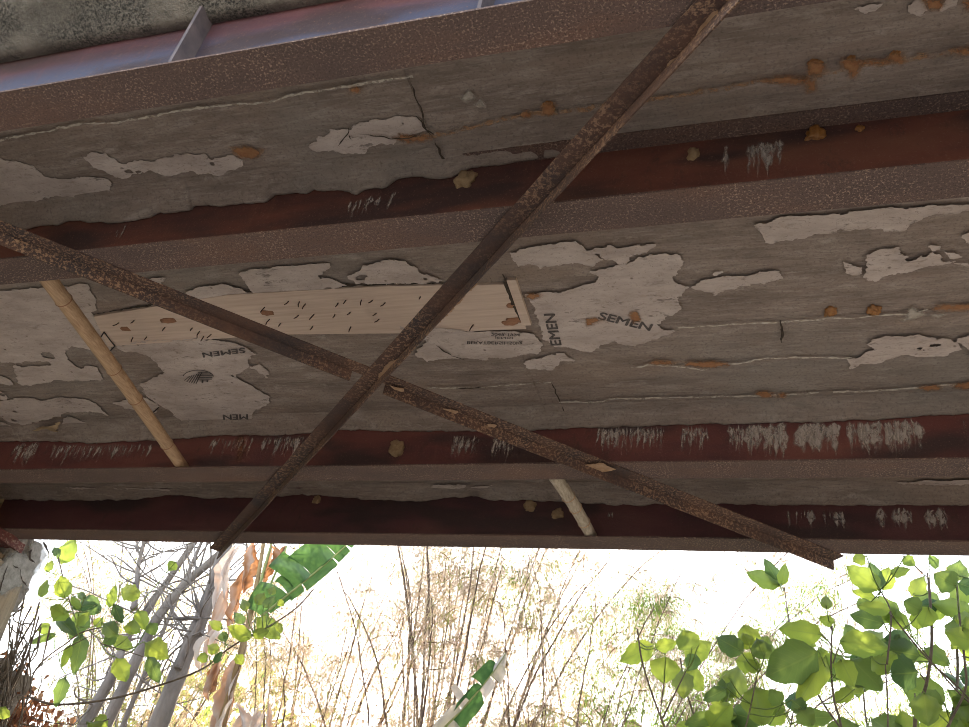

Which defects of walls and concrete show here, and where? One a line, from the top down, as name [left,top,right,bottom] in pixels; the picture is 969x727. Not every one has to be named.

crack [338,77,445,159]
peeling [754,204,969,244]
peeling [415,241,783,370]
peeling [0,287,108,426]
peeling [64,283,270,421]
peeling [847,334,969,369]
efflorescence [596,427,662,446]
efflorescence [727,419,924,453]
damp [788,510,845,525]
efflorescence [876,508,912,528]
efflorescence [925,509,945,526]
spalling [0,539,49,613]